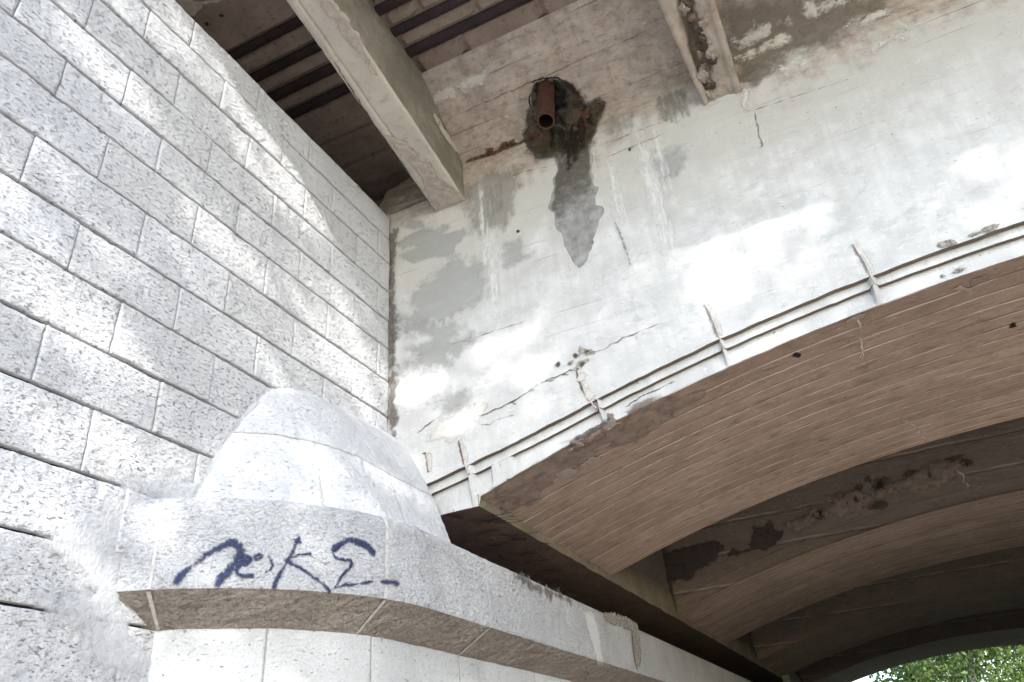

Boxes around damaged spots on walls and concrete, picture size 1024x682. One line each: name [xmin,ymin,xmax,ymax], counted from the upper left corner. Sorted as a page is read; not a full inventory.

spalling [678,0,719,101]
leakage [720,0,891,110]
leakage [523,78,682,269]
crack [479,369,574,425]
spalling [496,347,705,511]
peeling [663,521,784,582]